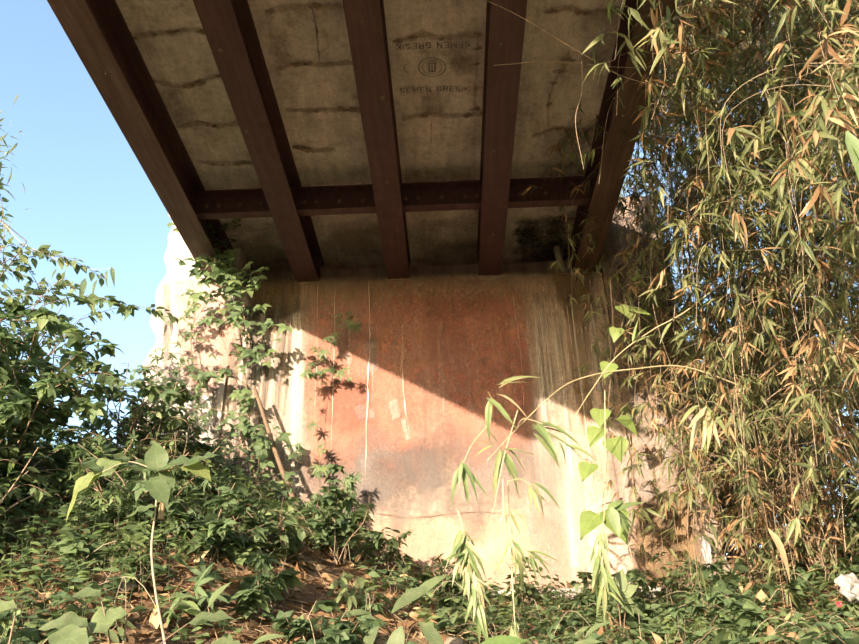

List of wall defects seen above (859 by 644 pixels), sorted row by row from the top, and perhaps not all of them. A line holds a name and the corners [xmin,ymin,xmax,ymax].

crack [265,3,352,75]
damp [514,214,575,263]
damp [231,265,358,482]
corrosion [304,278,535,481]
damp [409,271,613,461]
damp [622,315,635,377]
damp [326,405,583,590]